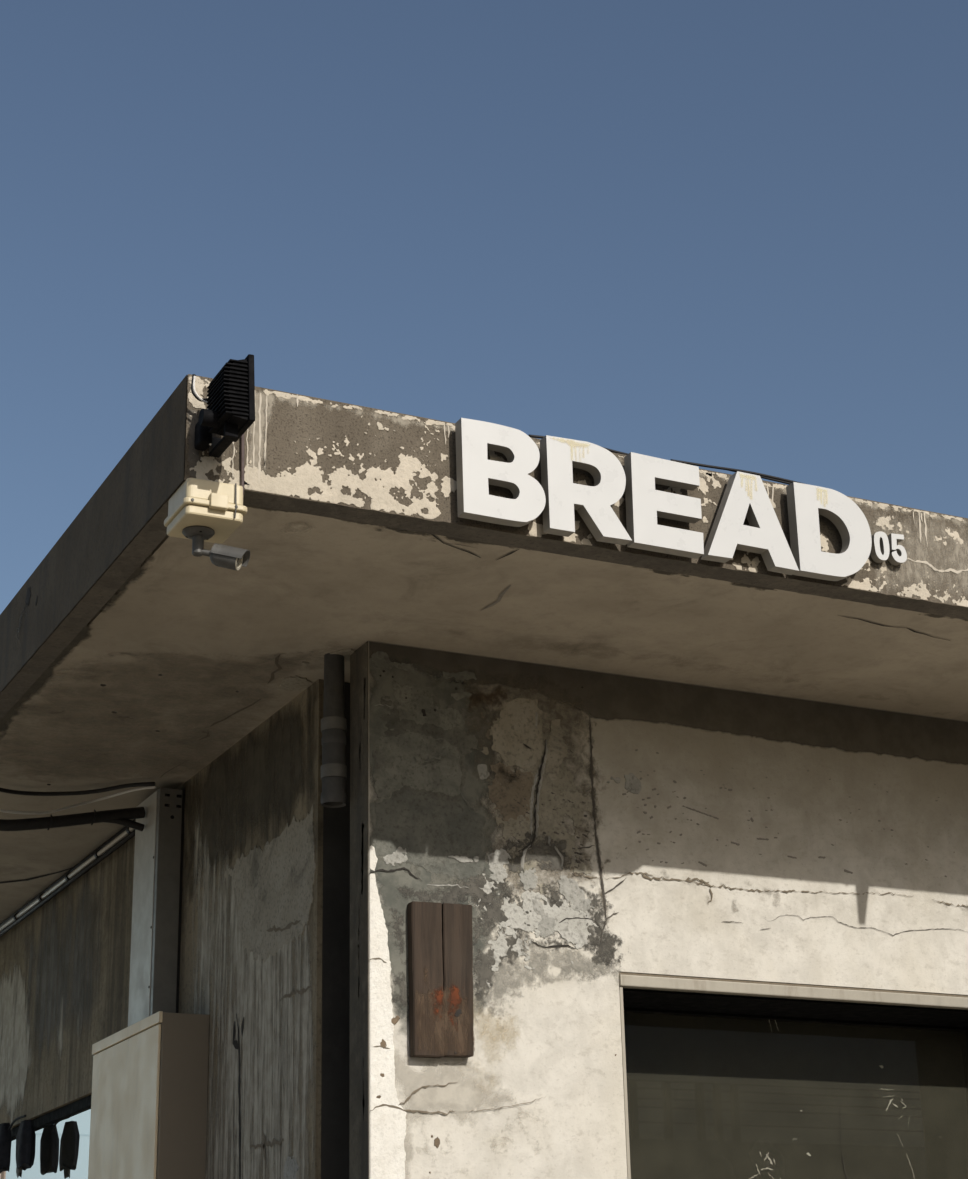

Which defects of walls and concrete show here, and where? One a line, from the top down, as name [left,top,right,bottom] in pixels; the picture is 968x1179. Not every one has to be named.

peeling [188,376,210,417]
water stain [232,391,316,484]
peeling [190,389,457,519]
water stain [356,409,454,444]
peeling [488,450,508,462]
peeling [848,497,964,546]
peeling [841,559,968,607]
water stain [0,623,224,773]
crack [518,712,968,949]
water stain [172,698,315,1179]
water stain [0,874,99,1123]
crack [370,1082,536,1115]